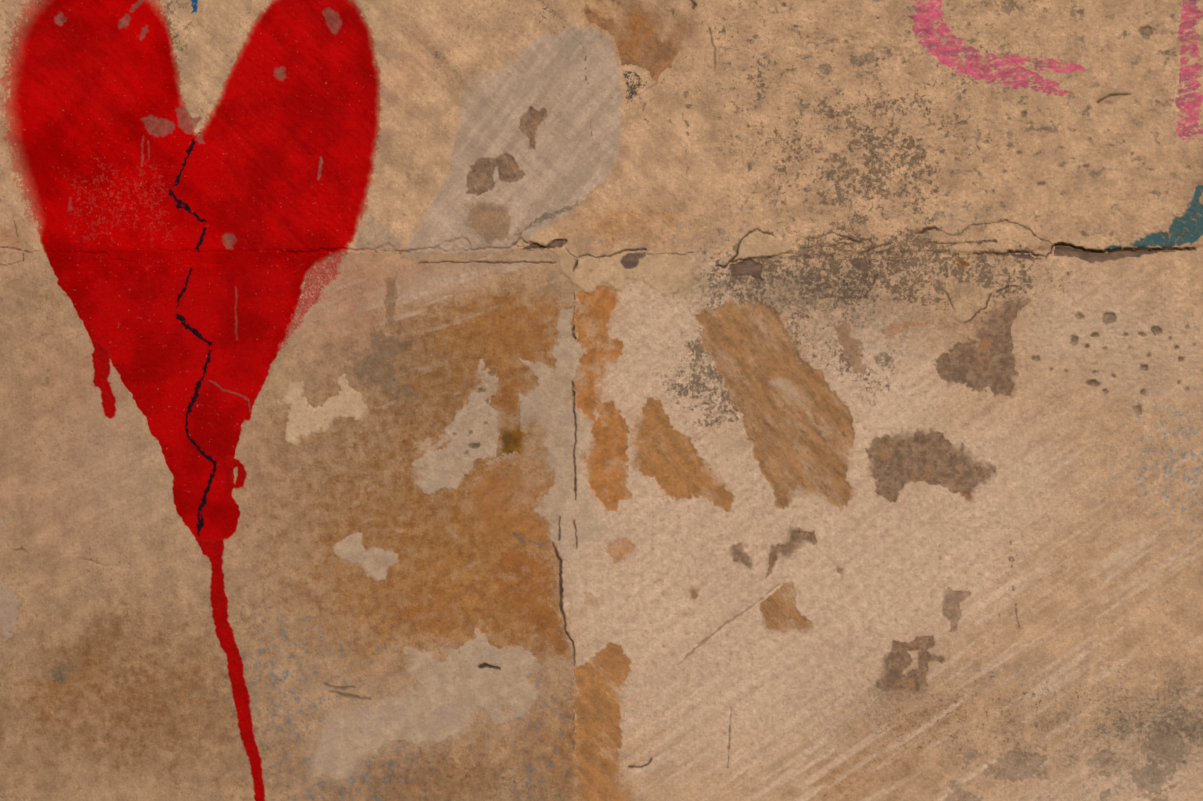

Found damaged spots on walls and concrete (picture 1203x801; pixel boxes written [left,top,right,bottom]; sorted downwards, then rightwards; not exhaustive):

crack [685,0,717,73]
crack [0,199,28,267]
spalling [520,238,568,251]
peeling [620,251,647,271]
spalling [451,386,490,457]
peeling [571,283,735,517]
peeling [686,227,1003,638]
peeling [933,281,1035,406]
crack [551,380,579,750]
spalling [322,682,373,702]
peeling [566,639,640,801]
peeling [869,587,973,707]